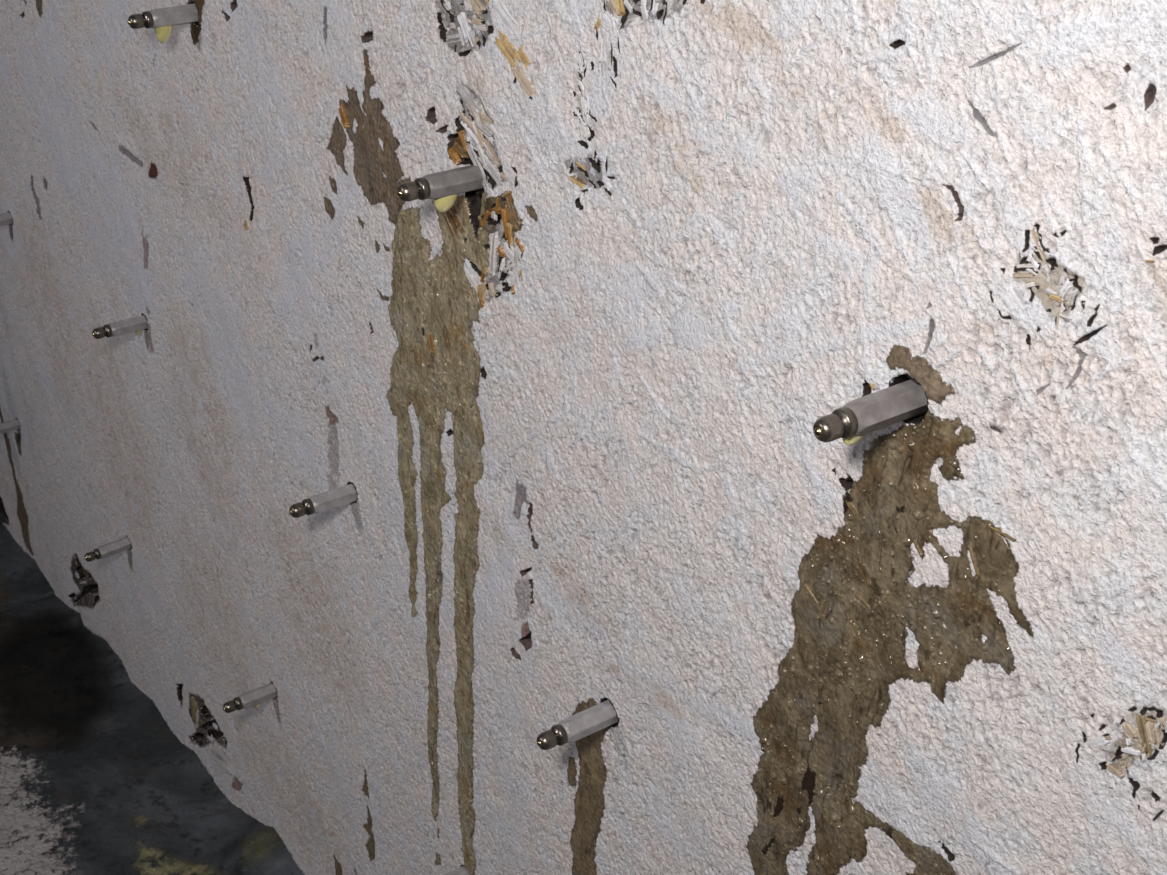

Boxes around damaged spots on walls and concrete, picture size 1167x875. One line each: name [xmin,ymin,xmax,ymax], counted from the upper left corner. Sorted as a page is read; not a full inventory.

spalling [436,0,522,56]
peeling [595,0,705,86]
spalling [447,79,524,308]
spalling [989,223,1107,345]
spalling [68,554,100,609]
spalling [177,684,242,790]
spalling [1075,707,1167,821]